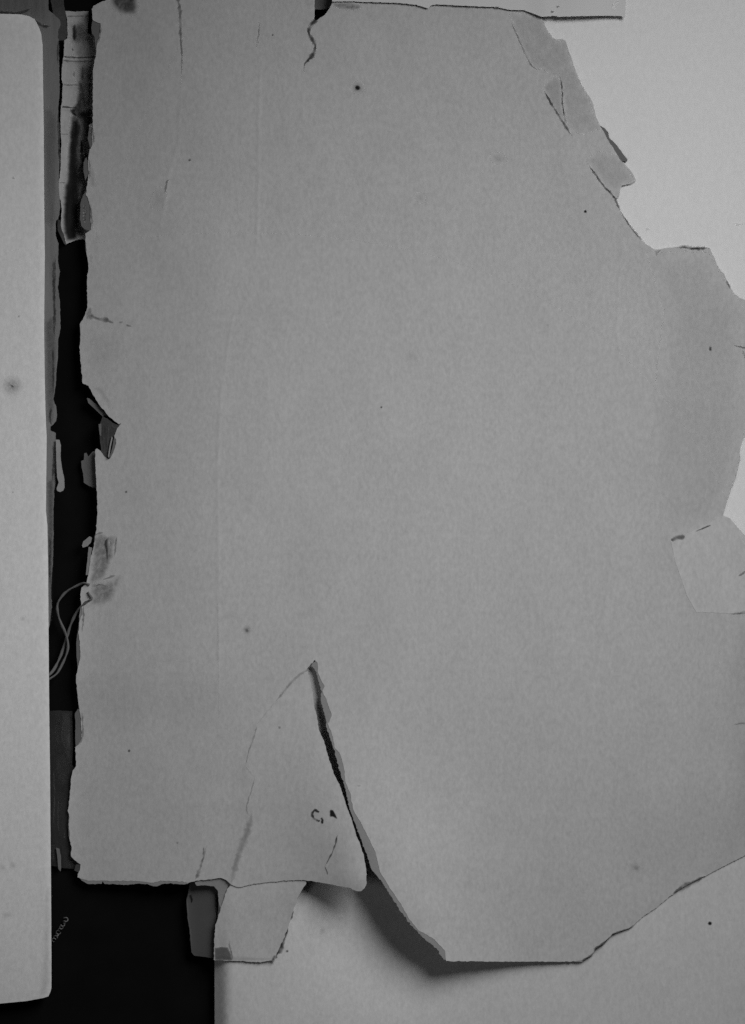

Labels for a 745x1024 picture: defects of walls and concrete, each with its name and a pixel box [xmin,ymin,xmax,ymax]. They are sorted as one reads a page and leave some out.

crack [305,20,317,63]